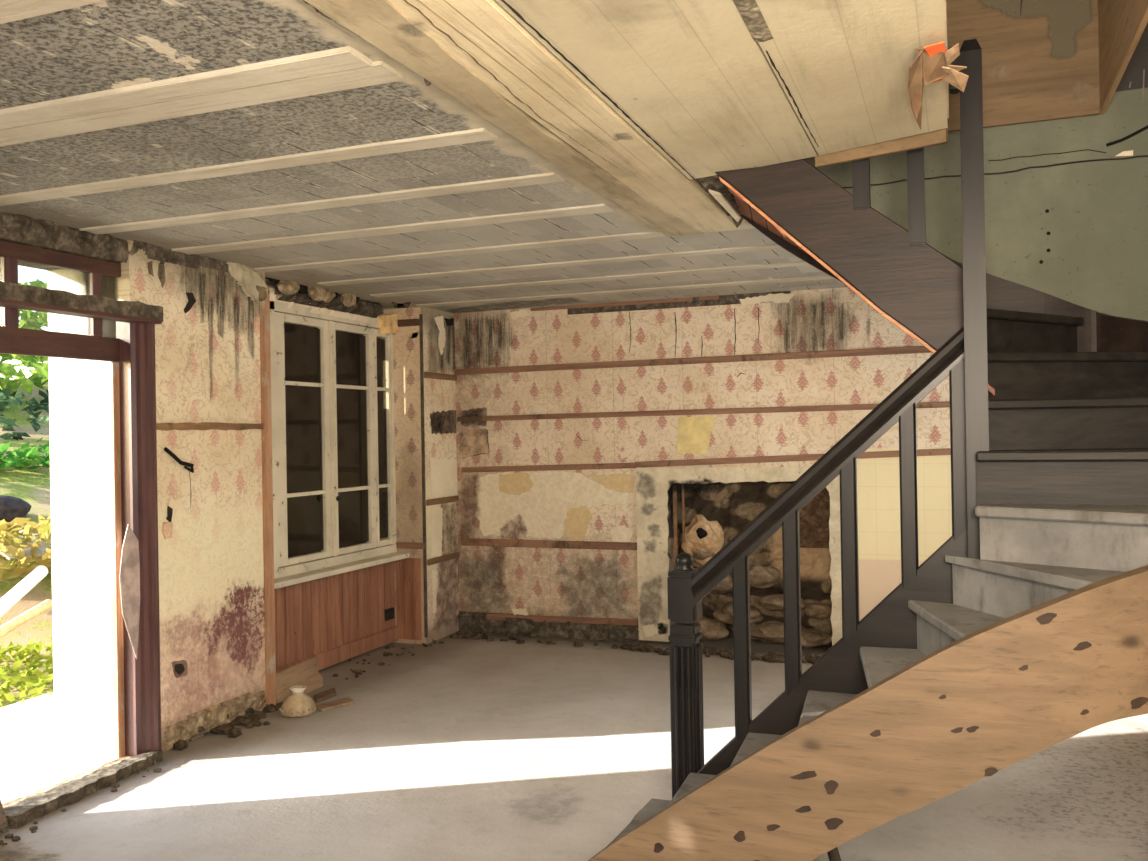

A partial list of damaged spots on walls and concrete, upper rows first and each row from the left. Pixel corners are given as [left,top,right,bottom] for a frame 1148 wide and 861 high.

damp [436,472,661,643]
spalling [642,624,658,637]